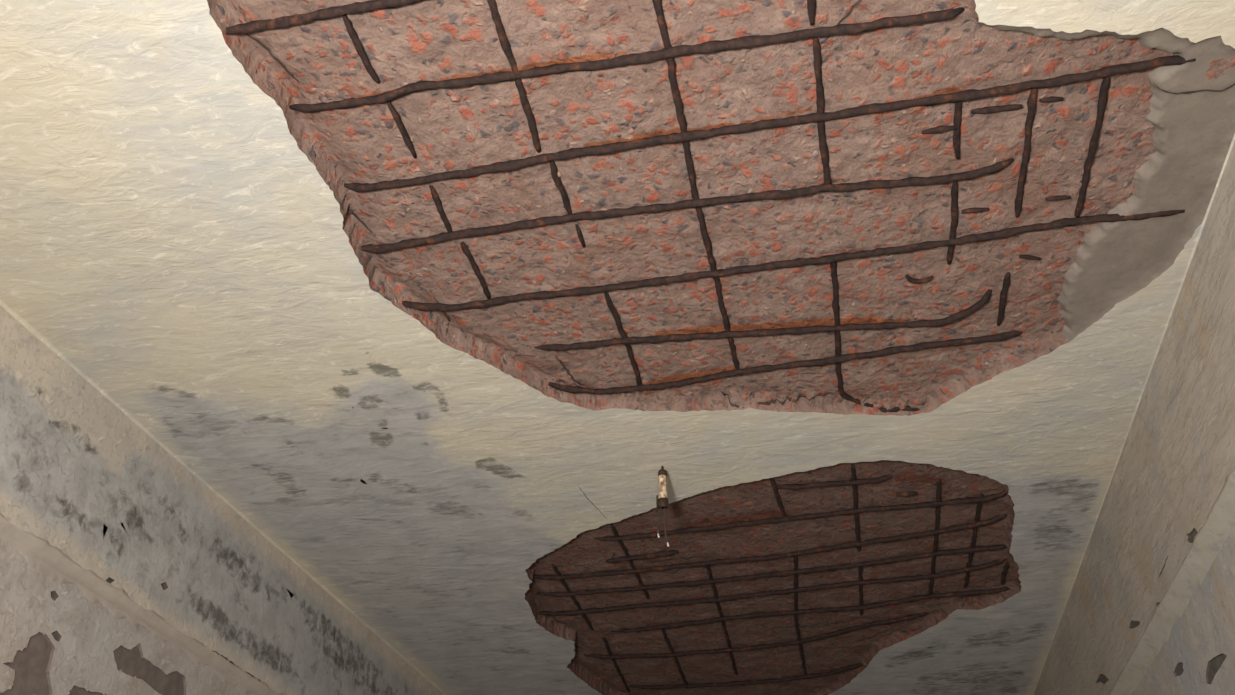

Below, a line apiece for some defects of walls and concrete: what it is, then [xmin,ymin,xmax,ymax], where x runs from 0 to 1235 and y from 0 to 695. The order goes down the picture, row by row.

spalling [207,0,1235,416]
leakage [0,348,602,695]
spalling [524,460,1022,695]
peeling [0,630,106,695]
peeling [113,643,187,695]
peeling [1174,662,1184,677]
peeling [1206,653,1227,684]